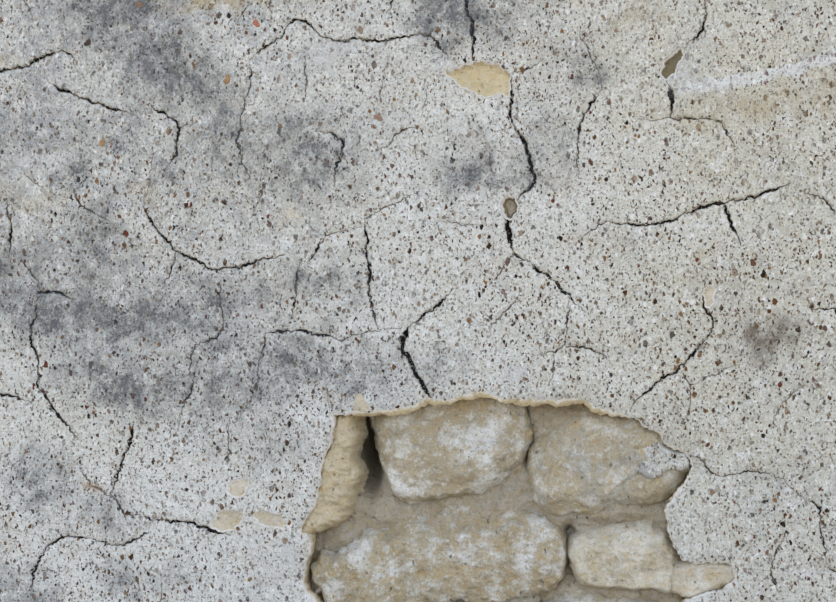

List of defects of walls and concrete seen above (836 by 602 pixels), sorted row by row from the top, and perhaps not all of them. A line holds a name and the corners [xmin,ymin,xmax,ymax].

crack [0,50,132,115]
crack [229,0,448,218]
spalling [444,60,512,99]
crack [508,59,543,201]
spalling [659,47,685,80]
crack [0,204,78,438]
crack [143,106,453,461]
crack [494,219,611,383]
crack [576,183,836,246]
crack [31,421,230,586]
spalling [210,509,287,533]
flaking render [300,392,737,602]